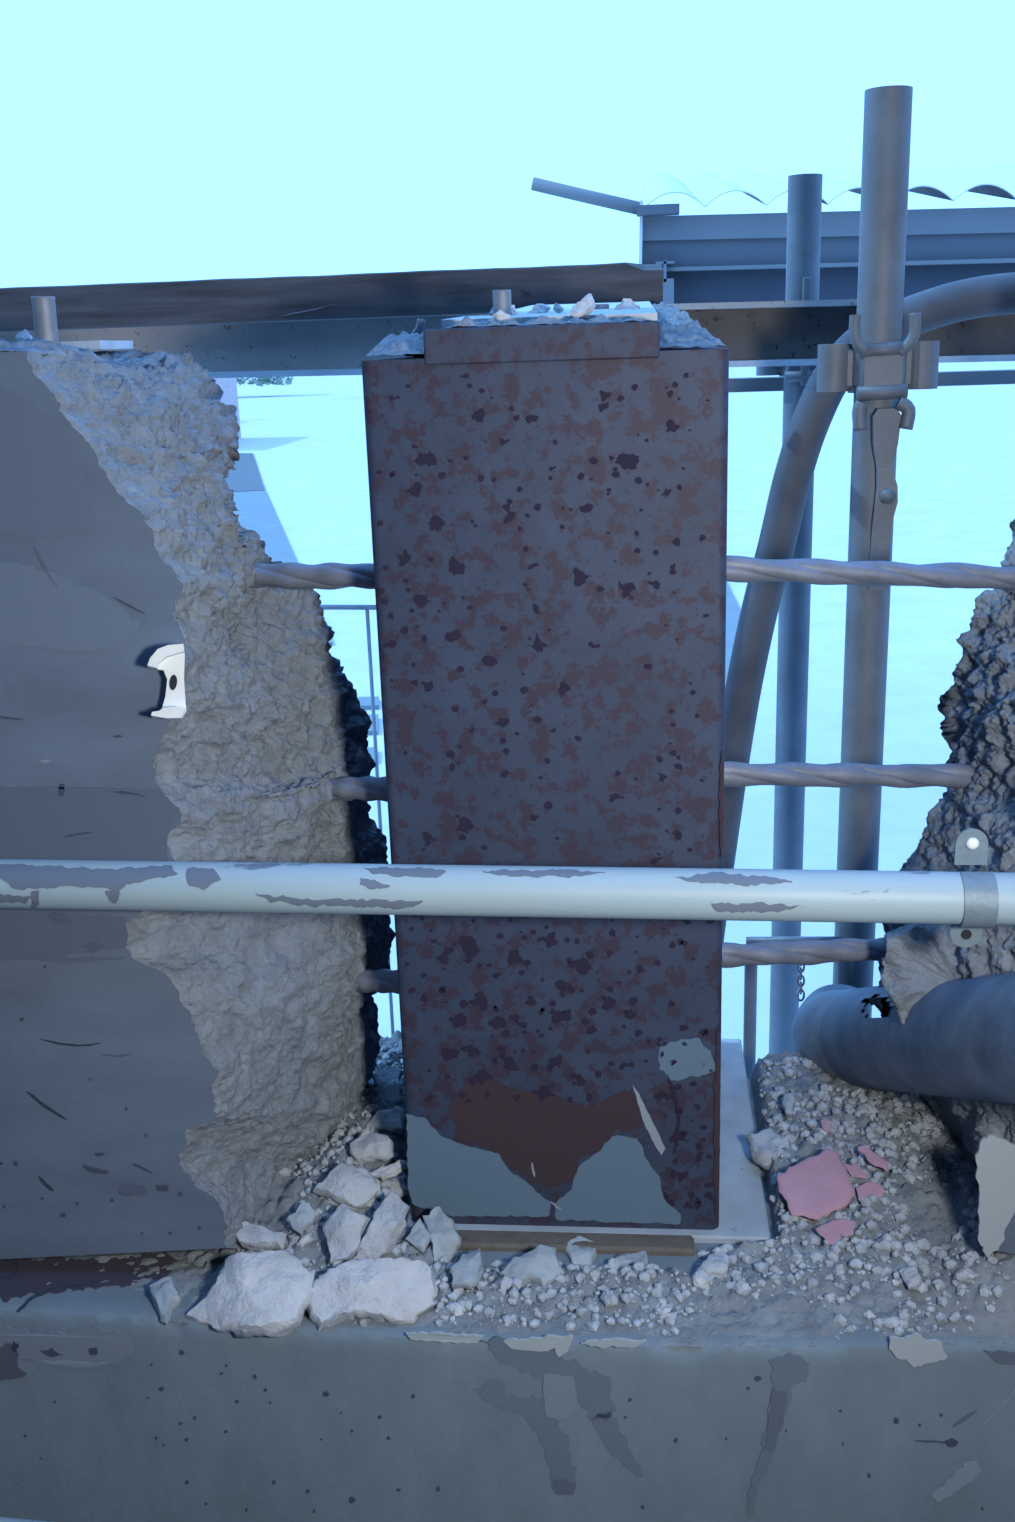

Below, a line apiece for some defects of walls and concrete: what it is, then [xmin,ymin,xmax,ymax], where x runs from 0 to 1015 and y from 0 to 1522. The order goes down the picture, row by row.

spalling [1000,519,1015,567]
spalling [0,336,389,864]
spalling [899,589,1015,872]
spalling [882,923,906,934]
spalling [956,925,1015,978]
spalling [878,961,892,1017]
spalling [27,1091,66,1120]
spalling [126,911,395,1249]
peeling [658,1038,715,1081]
peeling [406,1114,681,1225]
spalling [918,1094,1015,1257]